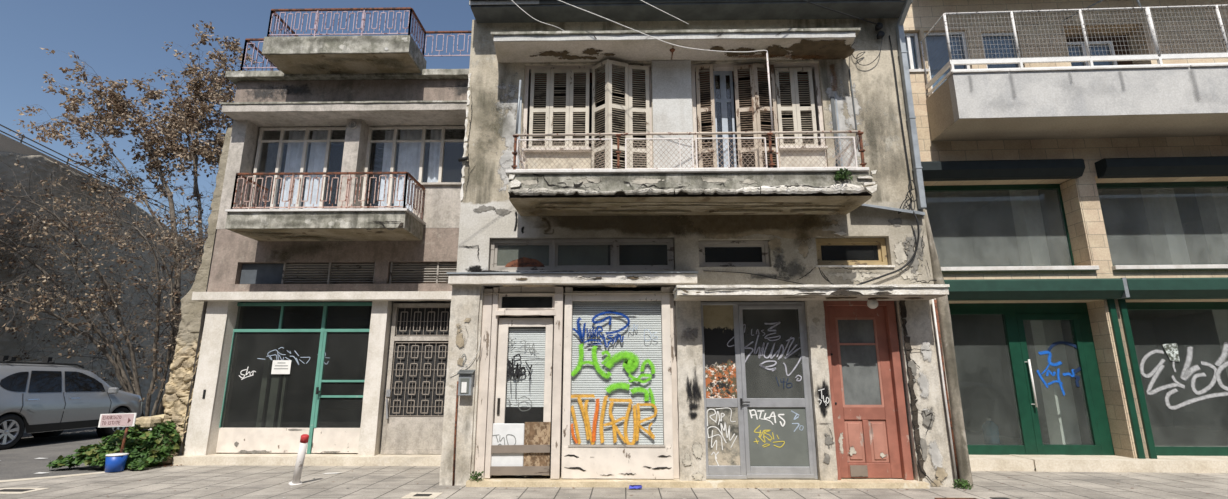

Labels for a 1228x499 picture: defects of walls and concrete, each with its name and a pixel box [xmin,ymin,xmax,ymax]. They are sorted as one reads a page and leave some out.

peeling [530,48,615,60]
peeling [710,39,855,60]
peeling [460,73,517,216]
peeling [496,76,877,259]
spalling [787,218,948,487]